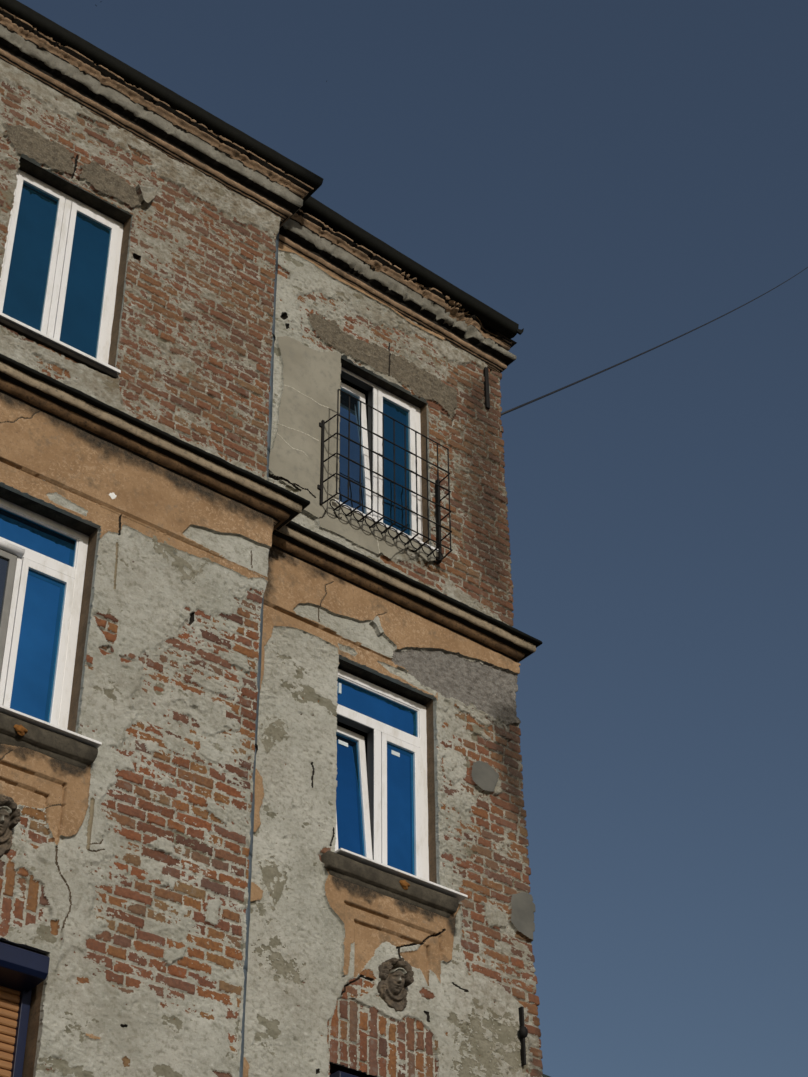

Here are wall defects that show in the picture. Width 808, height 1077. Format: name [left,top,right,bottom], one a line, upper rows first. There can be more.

spalling [0,77,290,477]
peeling [46,492,88,516]
peeling [152,524,271,583]
spalling [296,290,514,627]
crack [55,845,72,930]
spalling [0,586,306,1059]
spalling [293,603,543,1077]
crack [396,929,446,958]